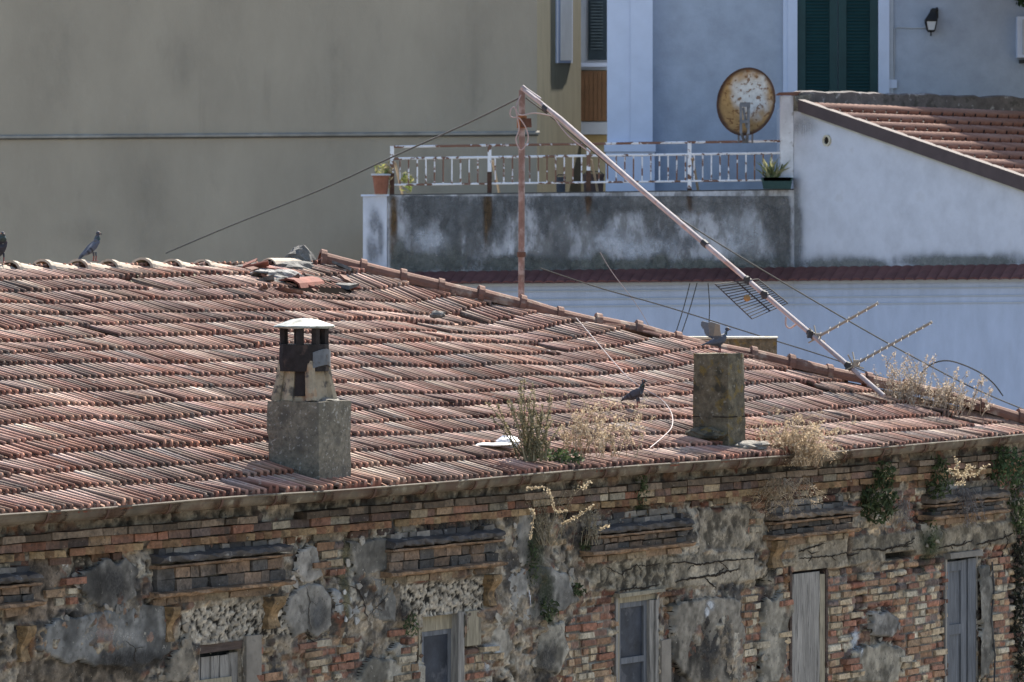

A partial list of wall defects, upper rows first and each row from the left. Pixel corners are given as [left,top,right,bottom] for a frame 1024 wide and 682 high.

leakage [368,190,886,272]
leakage [904,255,1017,266]
flaking render [34,557,195,682]
spalling [282,532,425,682]
spalling [464,515,616,682]
crack [606,558,772,591]
crack [799,538,915,568]
spalling [827,568,948,682]